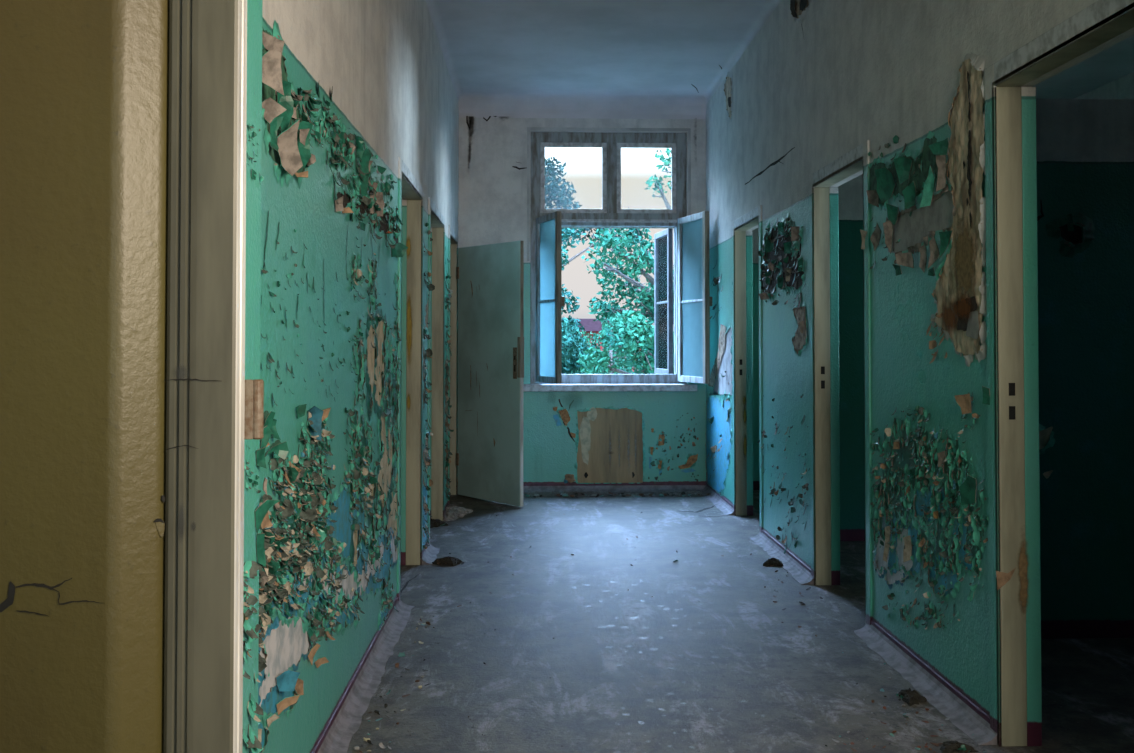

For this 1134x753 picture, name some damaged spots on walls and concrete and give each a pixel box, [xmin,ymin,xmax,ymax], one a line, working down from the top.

peeling [262,21,316,189]
peeling [758,213,809,357]
spalling [860,52,987,367]
crack [0,578,98,616]
peeling [242,252,454,753]
flaking render [574,261,810,554]
peeling [869,386,1028,630]